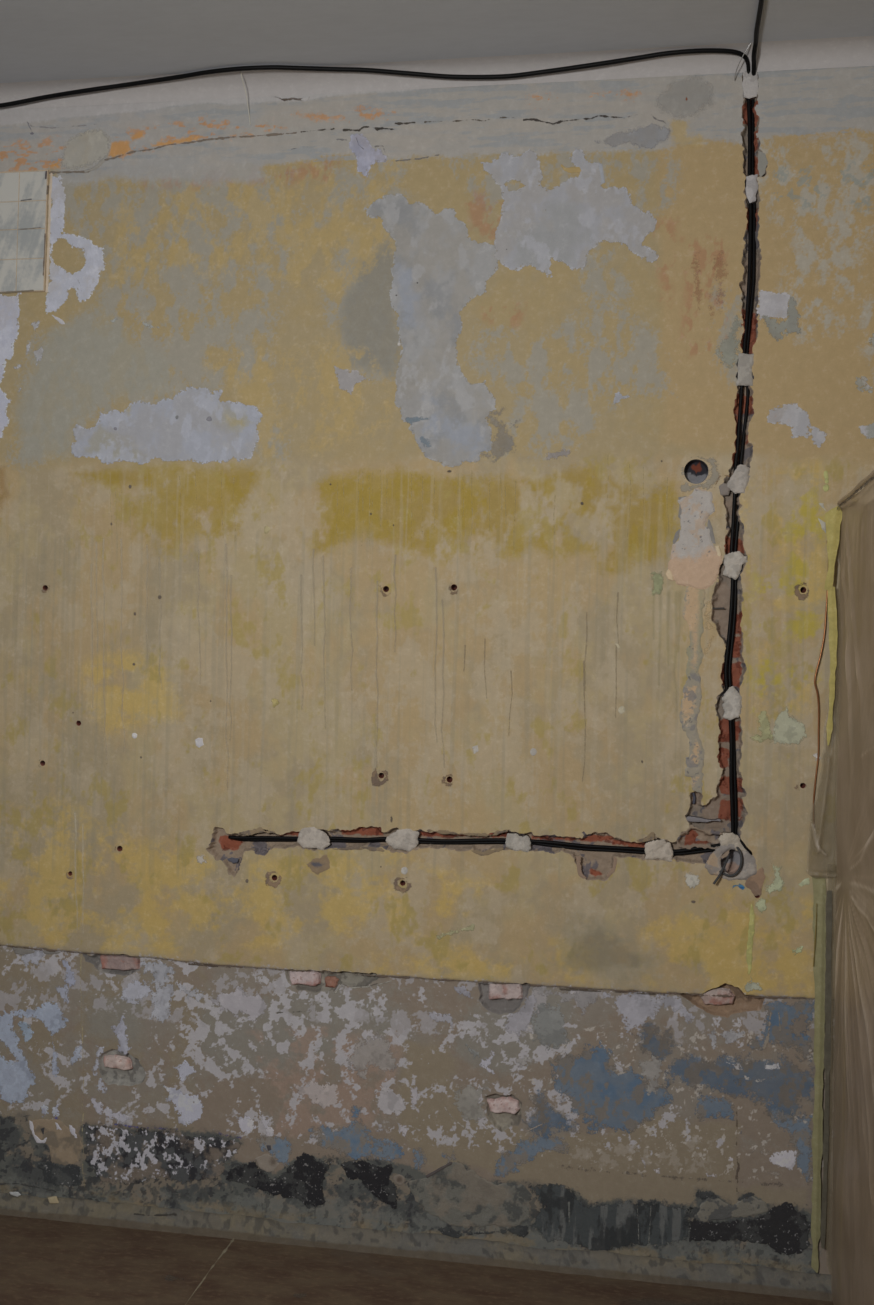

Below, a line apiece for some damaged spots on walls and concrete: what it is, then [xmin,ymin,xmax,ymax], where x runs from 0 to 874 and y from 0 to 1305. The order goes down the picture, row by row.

crack [49,96,665,174]
peeling [0,175,106,438]
peeling [364,148,659,467]
peeling [756,290,801,342]
peeling [71,386,263,465]
peeling [767,403,827,448]
spalling [285,969,387,993]
spalling [478,983,531,1015]
spalling [680,983,765,1050]
spalling [98,1049,146,1086]
spalling [29,1104,83,1166]
spalling [485,1094,522,1132]